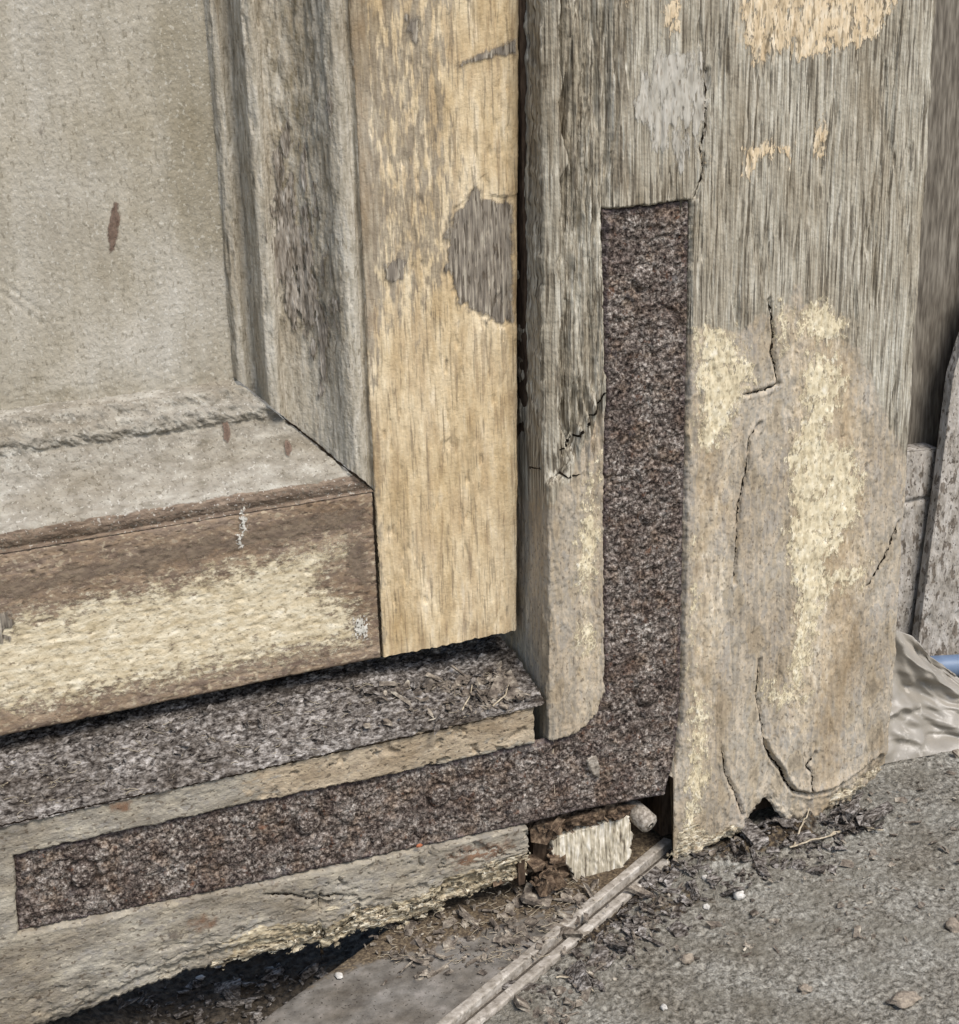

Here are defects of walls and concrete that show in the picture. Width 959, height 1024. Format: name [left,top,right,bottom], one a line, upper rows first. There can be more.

crack [694,80,707,196]
crack [744,301,777,395]
crack [529,392,607,479]
crack [733,430,754,576]
leakage [0,510,366,598]
crack [869,525,897,584]
crack [755,661,843,794]
crack [721,751,742,814]